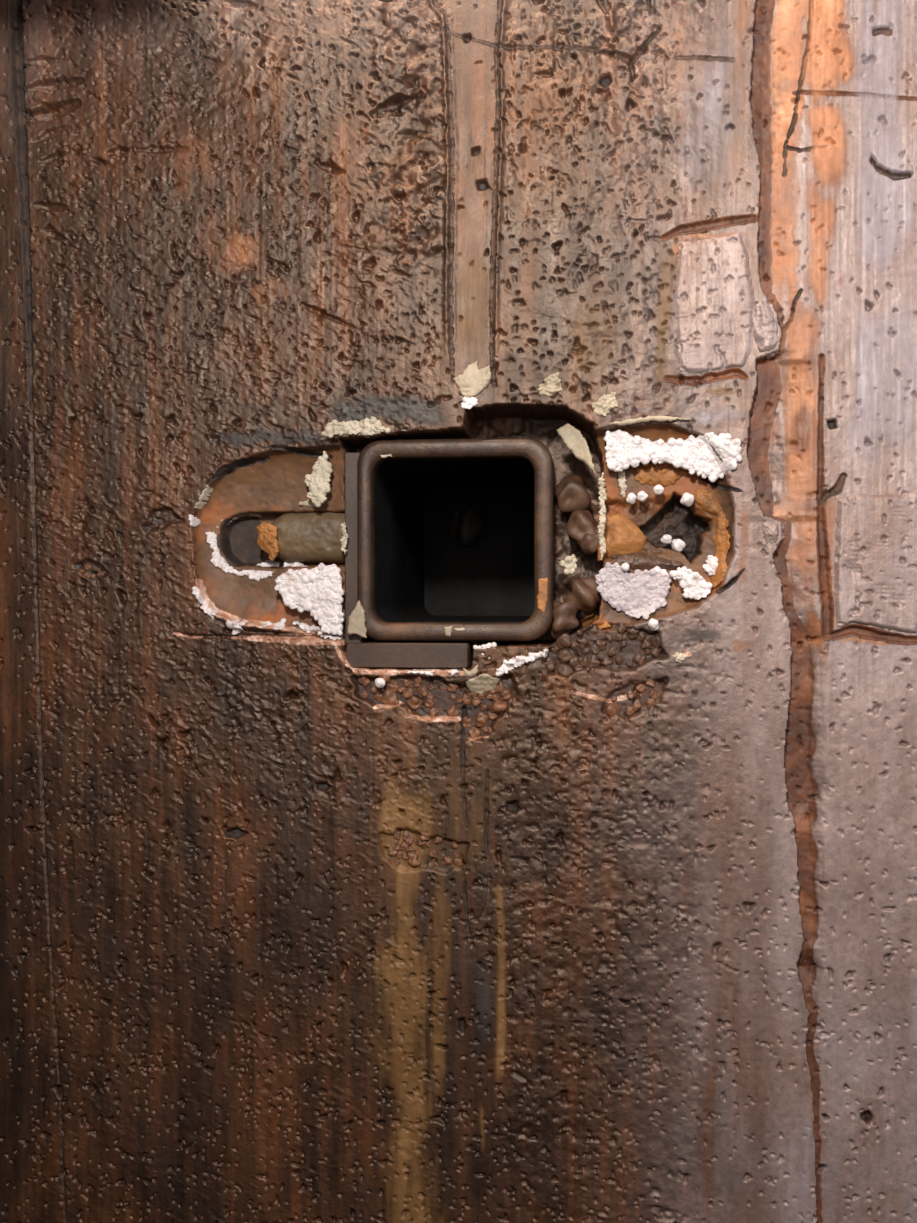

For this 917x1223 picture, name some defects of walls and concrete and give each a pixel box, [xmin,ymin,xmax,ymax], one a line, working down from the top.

rust [786,0,852,581]
peeling [609,415,691,426]
peeling [556,424,597,475]
rust [634,462,688,486]
rust [612,552,685,570]
rust [693,488,747,588]
water stain [195,578,315,635]
peeling [348,600,367,638]
crack [426,0,917,1223]
spalling [544,622,669,719]